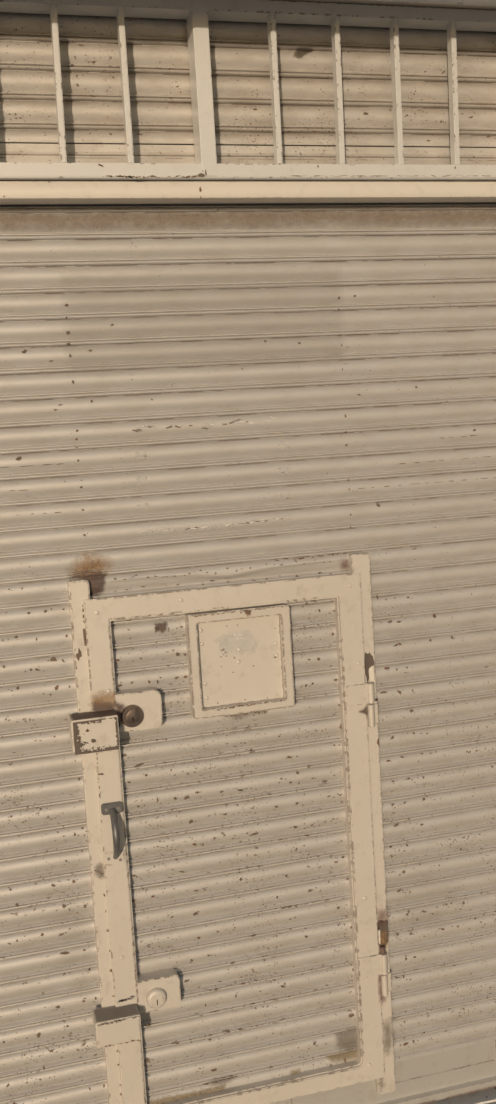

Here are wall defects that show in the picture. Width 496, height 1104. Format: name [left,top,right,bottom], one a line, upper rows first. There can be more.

corrosion [69,558,106,595]
peeling [24,605,87,672]
peeling [365,652,414,694]
corrosion [69,694,124,727]
peeling [73,709,148,798]
corrosion [378,914,389,946]